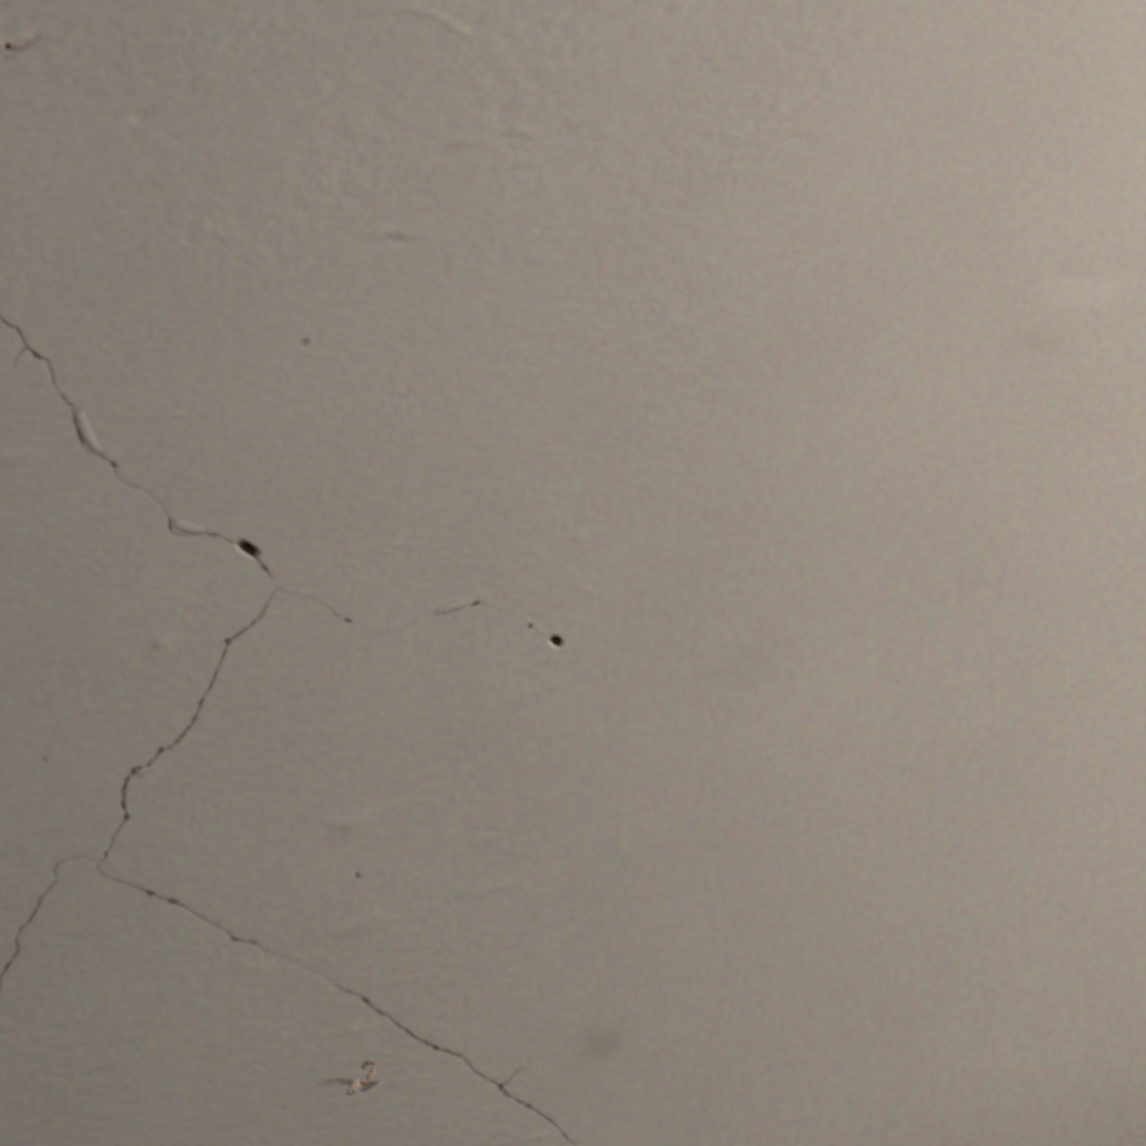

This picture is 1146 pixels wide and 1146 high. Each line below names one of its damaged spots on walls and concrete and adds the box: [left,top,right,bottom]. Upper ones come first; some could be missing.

crack [4,321,41,359]
crack [63,396,117,467]
crack [239,541,267,571]
crack [529,624,560,646]
crack [122,622,255,819]
crack [363,998,461,1056]